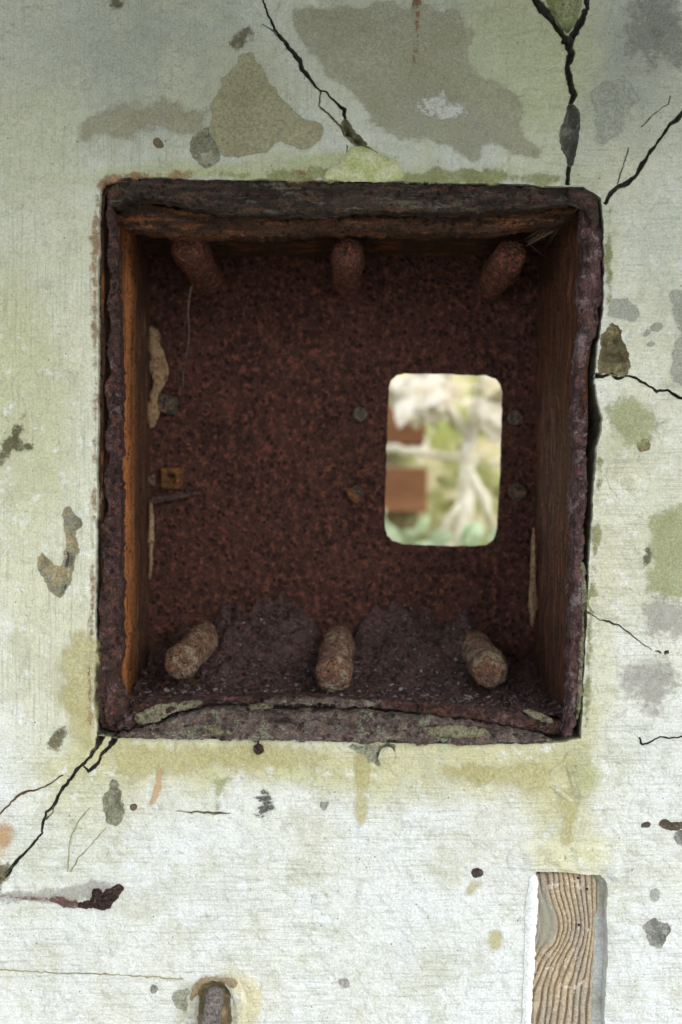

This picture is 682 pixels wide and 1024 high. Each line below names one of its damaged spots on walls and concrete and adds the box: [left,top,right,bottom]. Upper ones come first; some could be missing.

peeling [189,52,323,169]
crack [262,0,377,153]
damp [293,2,539,161]
crack [532,0,590,108]
crack [603,96,682,205]
rust [89,172,148,347]
spalling [597,298,640,377]
spalling [37,506,83,598]
crack [0,730,119,878]
damp [117,746,327,810]
damp [253,790,274,818]
spalling [642,918,671,948]